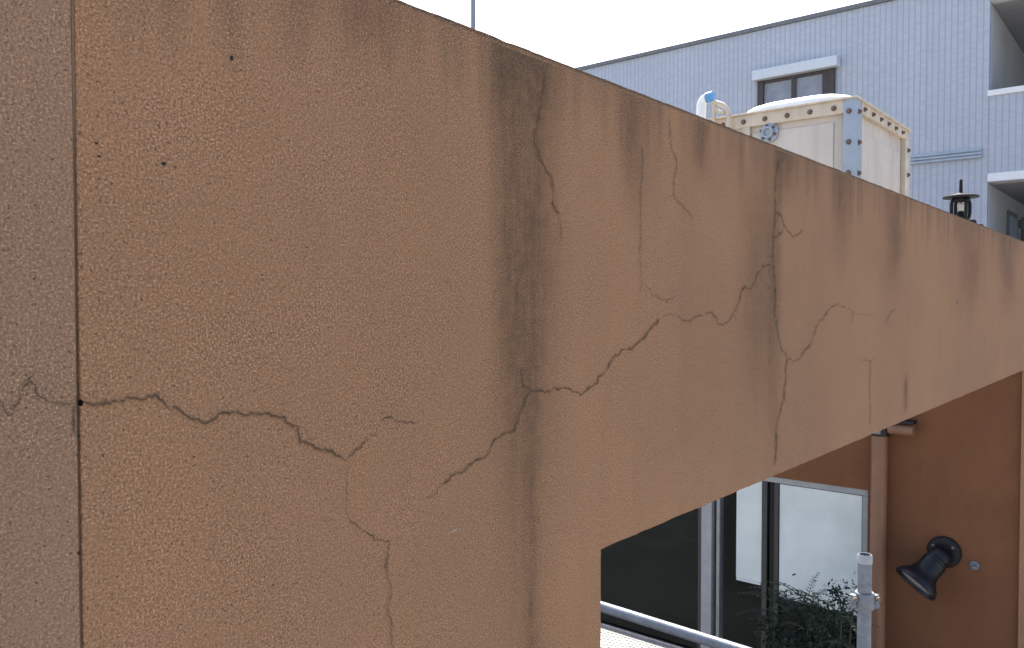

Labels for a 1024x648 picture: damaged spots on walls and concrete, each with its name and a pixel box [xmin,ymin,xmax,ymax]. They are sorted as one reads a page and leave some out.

crack [1,375,365,457]
crack [445,320,659,484]